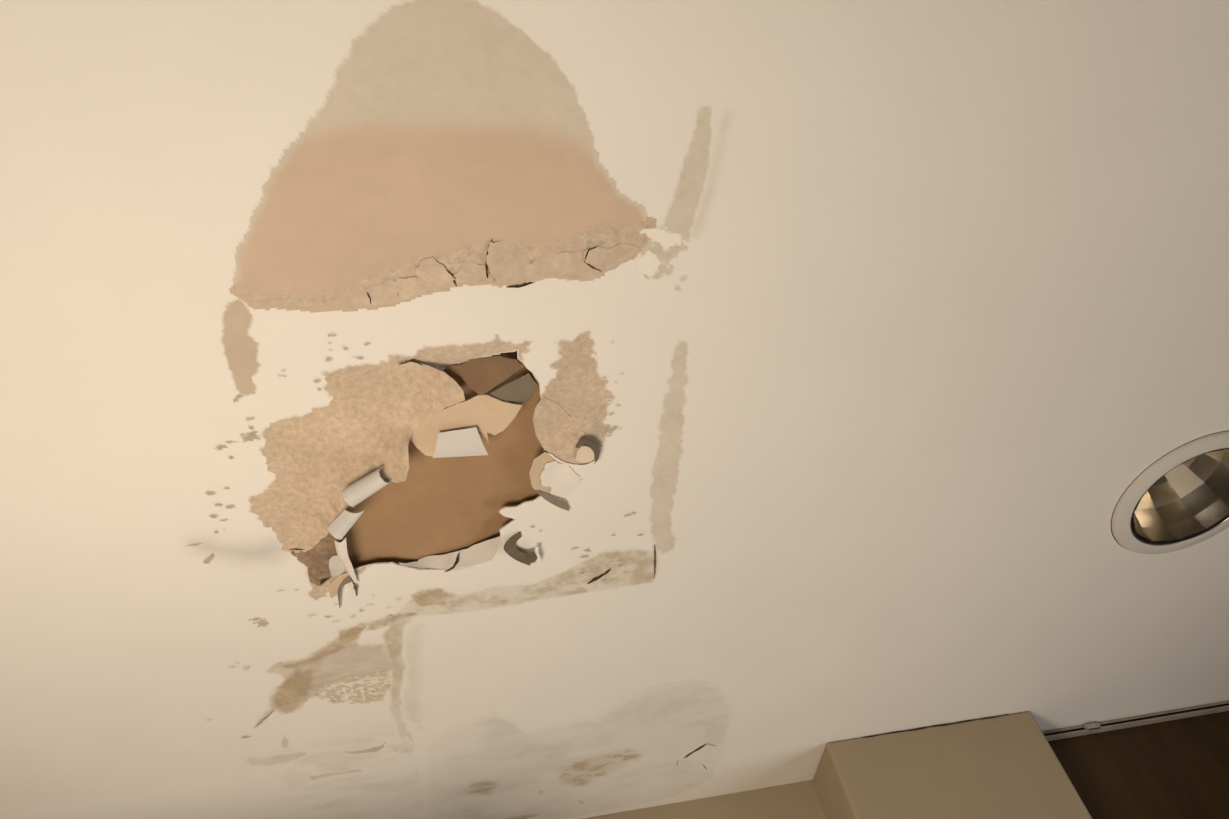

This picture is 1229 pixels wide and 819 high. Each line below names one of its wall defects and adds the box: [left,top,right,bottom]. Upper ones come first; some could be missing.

damp [229,0,738,313]
peeling [213,416,262,460]
peeling [219,299,263,404]
peeling [325,332,371,363]
peeling [533,329,625,481]
peeling [227,594,403,739]